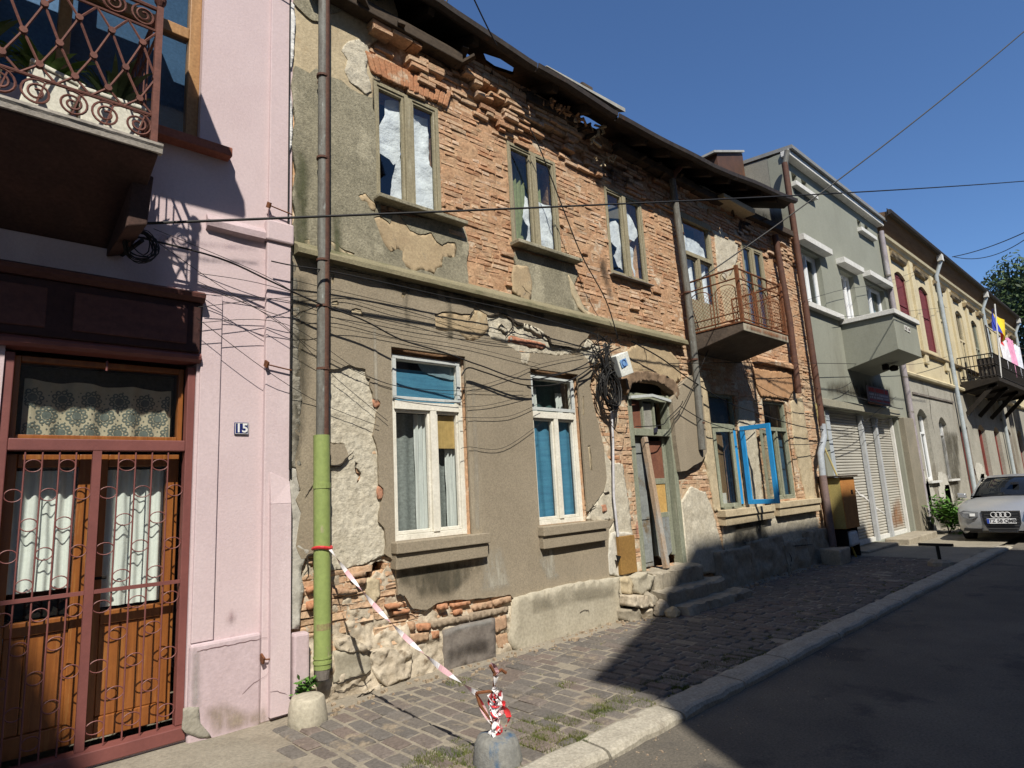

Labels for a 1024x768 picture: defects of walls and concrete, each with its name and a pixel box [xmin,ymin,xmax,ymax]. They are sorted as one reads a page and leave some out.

flaking render [341,19,826,572]
flaking render [291,555,313,656]
spalling [329,365,420,652]
flaking render [434,595,509,618]